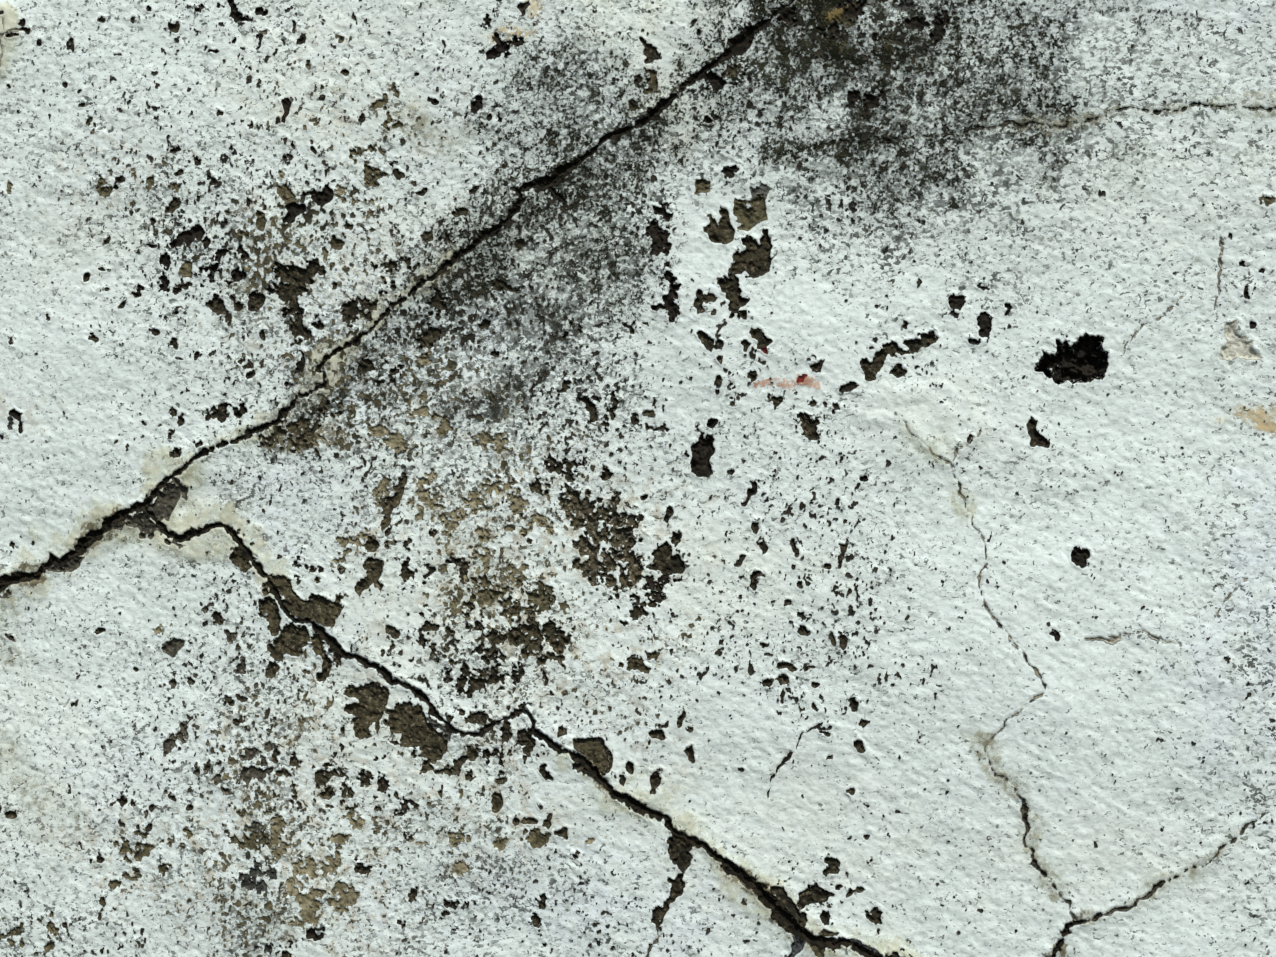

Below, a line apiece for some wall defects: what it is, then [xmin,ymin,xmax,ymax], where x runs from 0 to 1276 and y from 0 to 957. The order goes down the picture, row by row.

crack [769,92,1276,158]
water stain [256,0,1203,456]
peeling [623,183,773,406]
spalling [1034,333,1109,384]
crack [1123,237,1224,355]
crack [0,0,919,957]
peeling [141,721,188,760]
peeling [178,424,685,957]
peeling [648,708,695,763]
crack [903,420,1269,957]
peeling [98,792,193,920]
peeling [651,834,693,925]